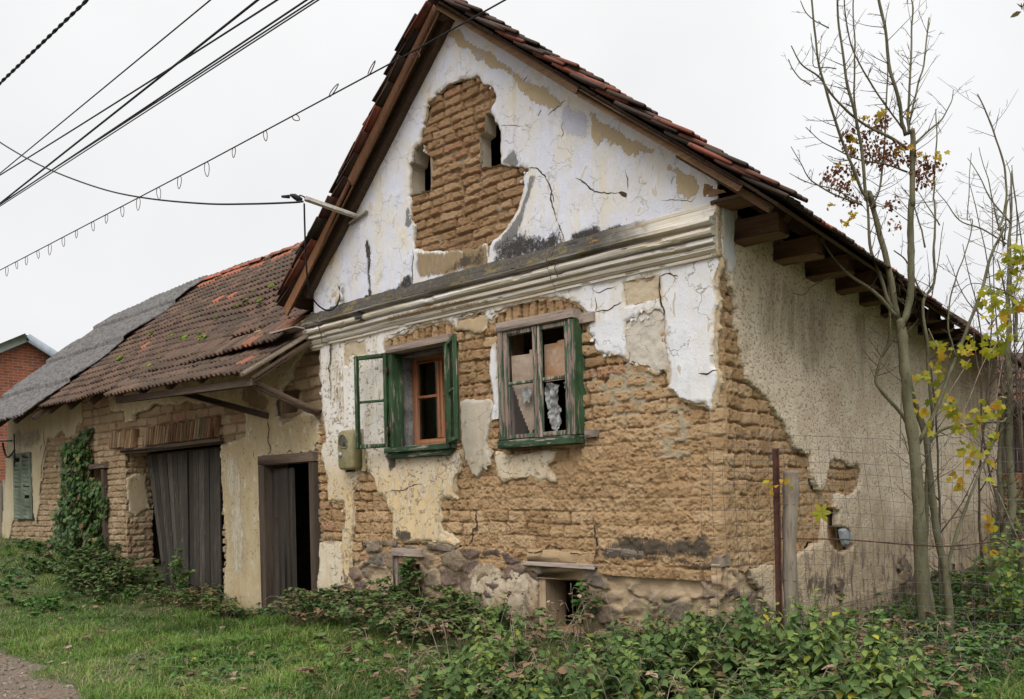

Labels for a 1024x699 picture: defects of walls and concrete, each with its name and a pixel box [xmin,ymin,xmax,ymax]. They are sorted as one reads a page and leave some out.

water stain [363,240,372,298]
spalling [409,76,529,252]
water stain [397,175,638,288]
crack [526,167,565,277]
crack [576,175,628,197]
spalling [11,395,246,566]
spalling [279,346,444,569]
spalling [386,270,859,581]
water stain [601,534,711,569]